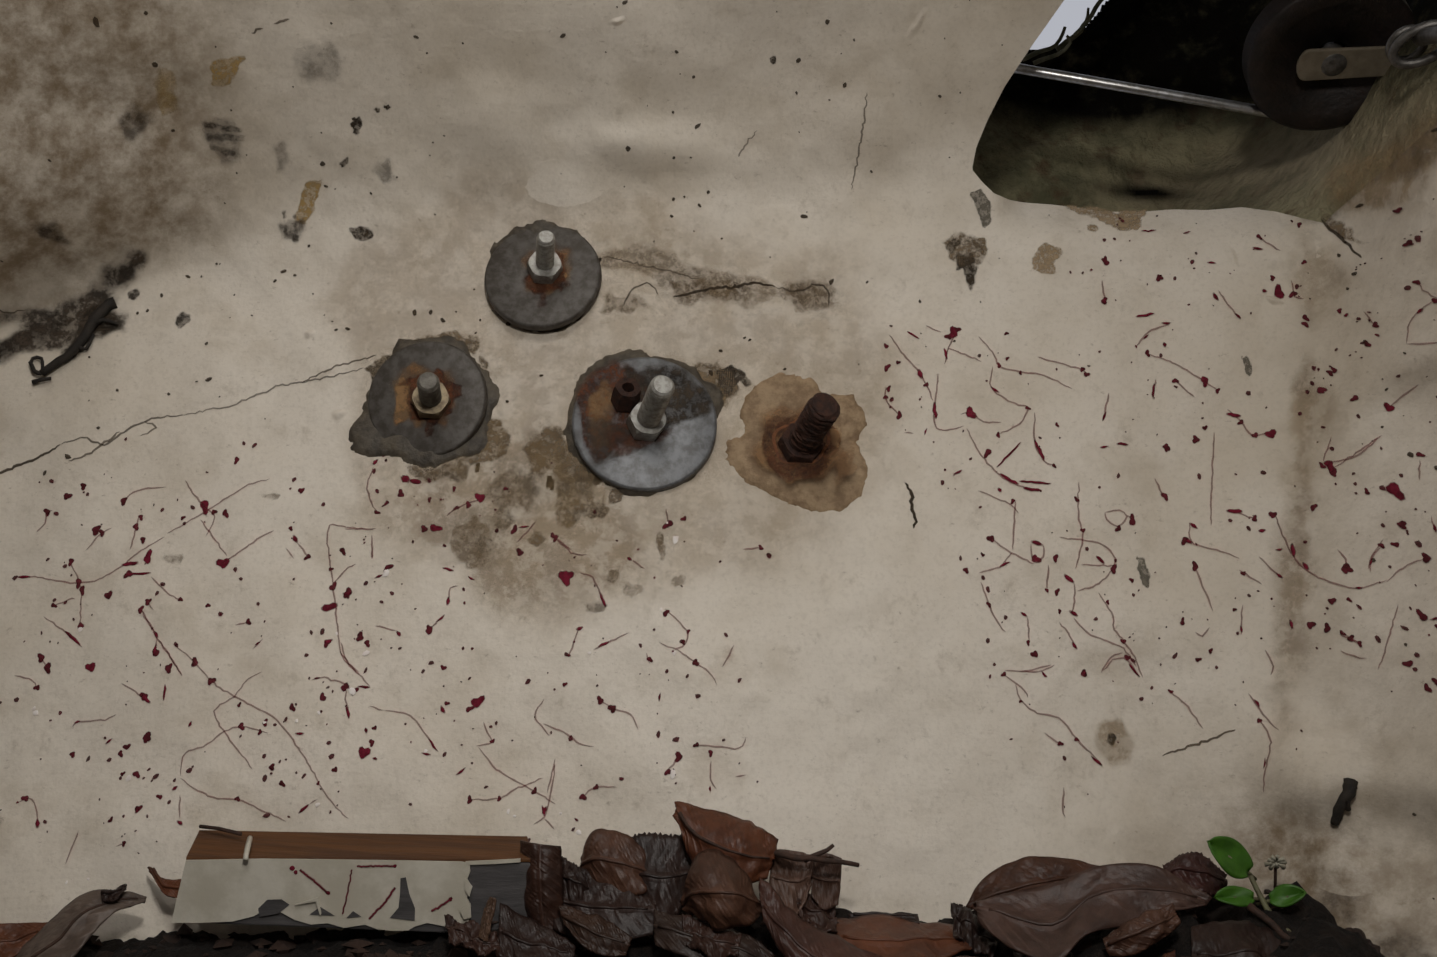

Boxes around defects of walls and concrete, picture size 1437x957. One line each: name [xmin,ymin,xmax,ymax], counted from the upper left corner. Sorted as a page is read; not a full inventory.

peeling [1067,205,1147,231]
water stain [0,309,63,362]
crack [0,355,375,474]
rust [394,364,461,436]
rust [576,361,712,461]
rust [753,407,855,482]
water stain [314,419,643,718]
water stain [18,480,347,825]
water stain [359,706,437,760]
water stain [534,701,591,747]
water stain [597,696,637,727]
water stain [467,724,555,828]